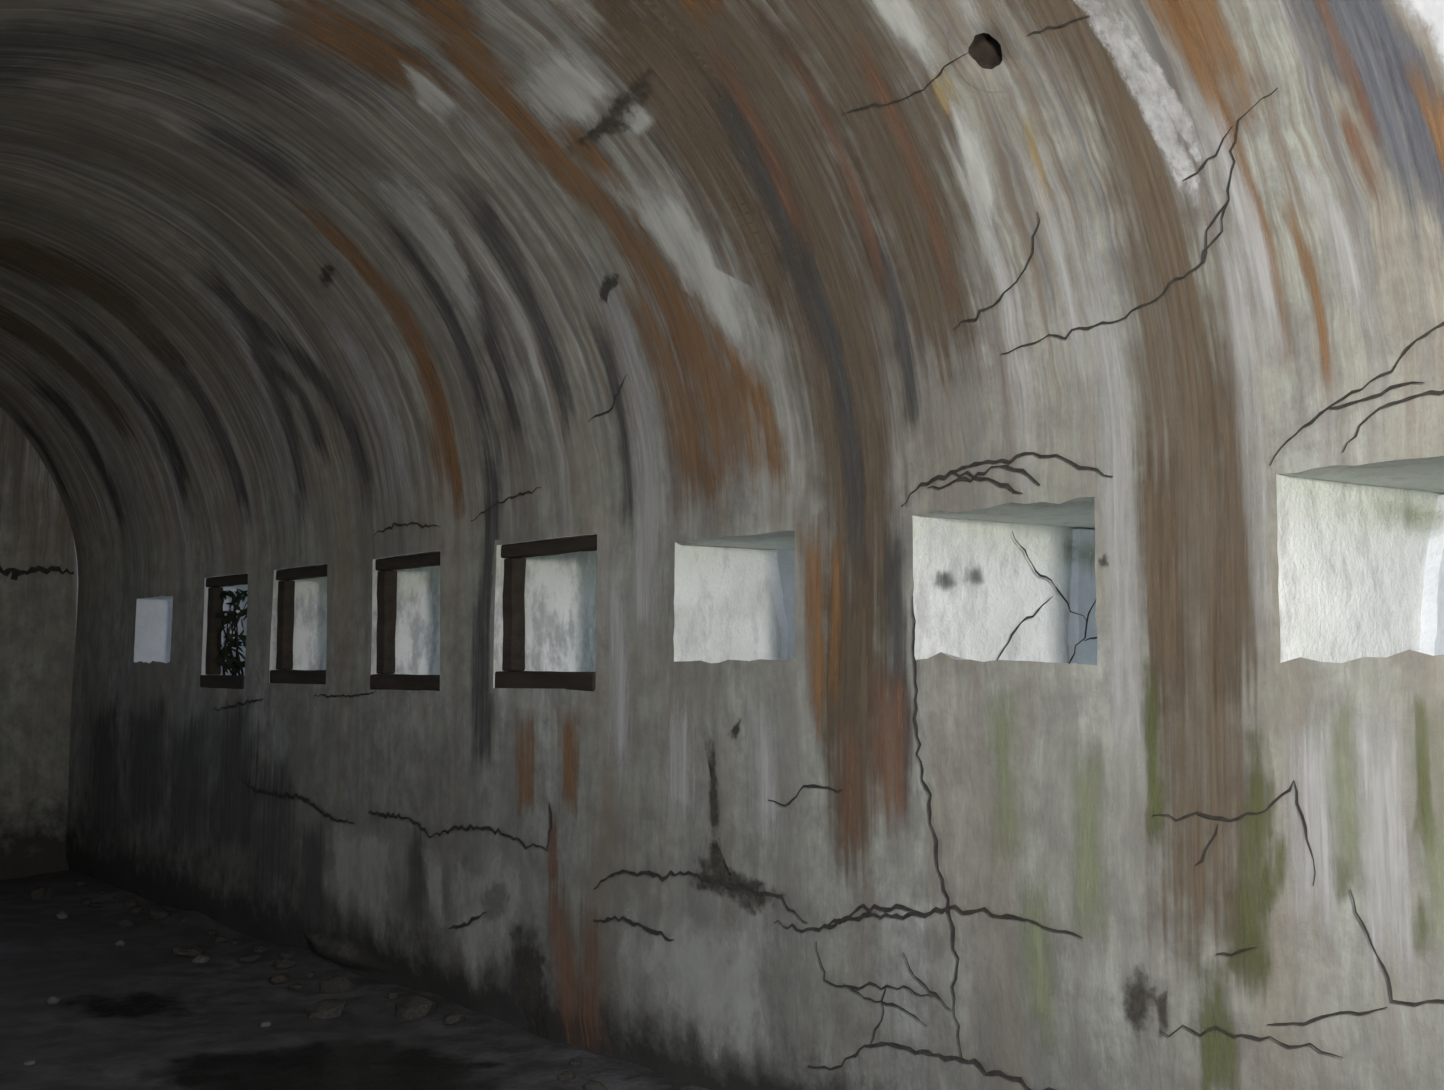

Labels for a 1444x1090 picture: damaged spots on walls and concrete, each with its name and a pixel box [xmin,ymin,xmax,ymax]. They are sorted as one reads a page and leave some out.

peeling [1403,0,1444,55]
rust [410,0,780,492]
crack [1001,88,1278,355]
damp [1019,0,1287,979]
rust [1147,0,1282,318]
rust [1293,221,1329,377]
crack [1270,322,1444,466]
crack [593,596,1082,1090]
damp [1292,726,1403,963]
damp [1417,710,1443,886]
damp [1201,978,1236,1090]
crack [1160,889,1444,1058]